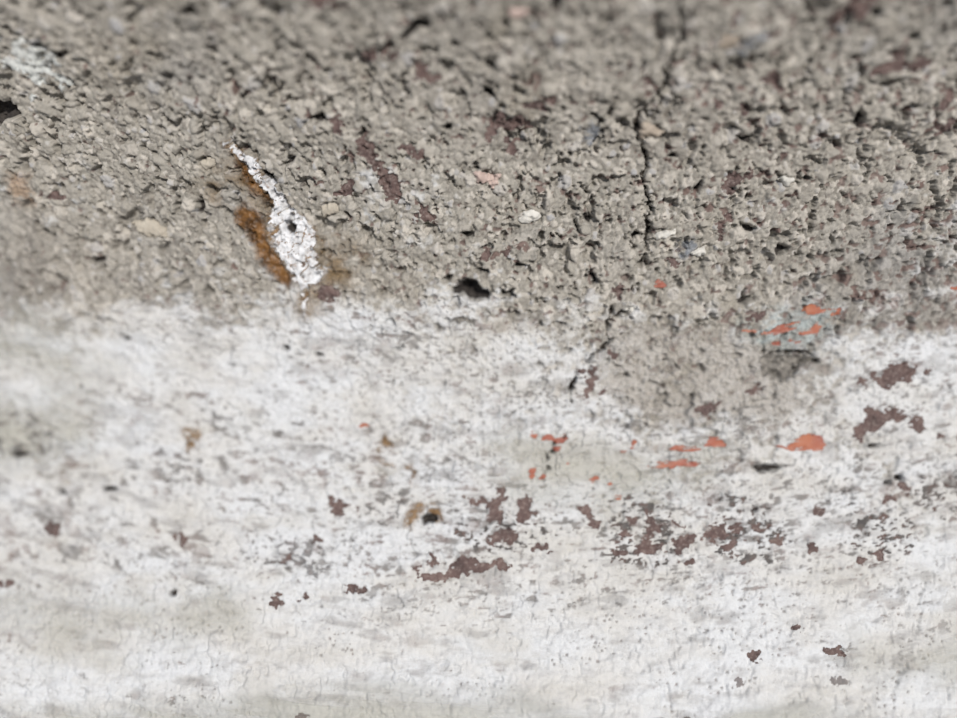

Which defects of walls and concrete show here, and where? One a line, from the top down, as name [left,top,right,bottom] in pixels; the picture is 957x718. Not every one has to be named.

crack [0,25,84,60]
crack [631,0,684,247]
rust [223,144,348,300]
crack [568,306,630,403]
peeling [857,361,932,391]
peeling [852,405,926,447]
peeling [648,436,727,469]
peeling [328,495,359,517]
peeling [411,487,534,583]
peeling [531,542,553,554]
peeling [611,508,784,566]
peeling [856,548,884,566]